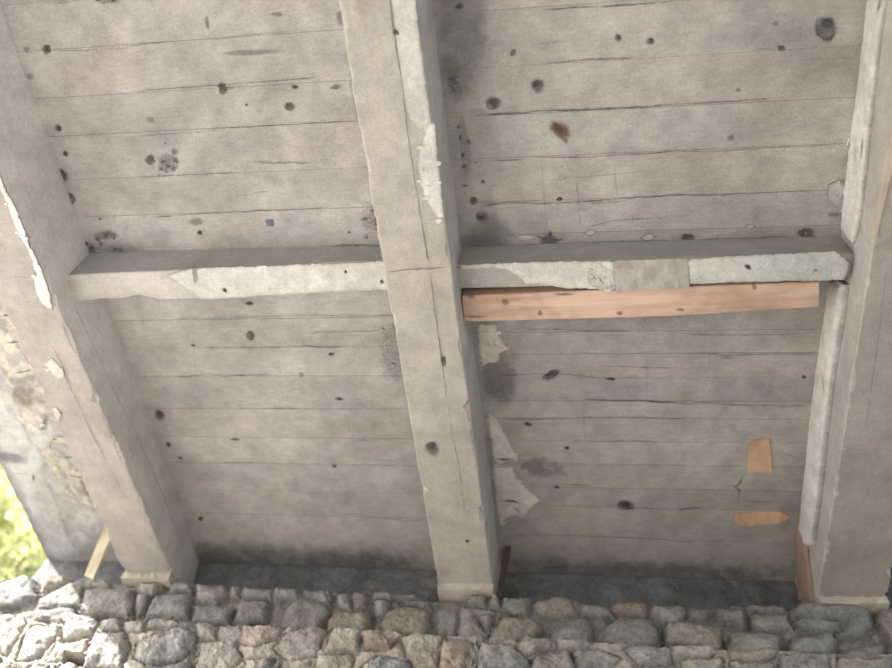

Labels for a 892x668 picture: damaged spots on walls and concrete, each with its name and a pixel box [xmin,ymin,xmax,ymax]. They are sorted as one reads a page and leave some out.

peeling [416,123,444,224]
rust [550,123,569,137]
peeling [0,175,53,310]
peeling [0,300,61,432]
peeling [478,324,509,366]
peeling [43,436,95,506]
peeling [486,413,541,525]